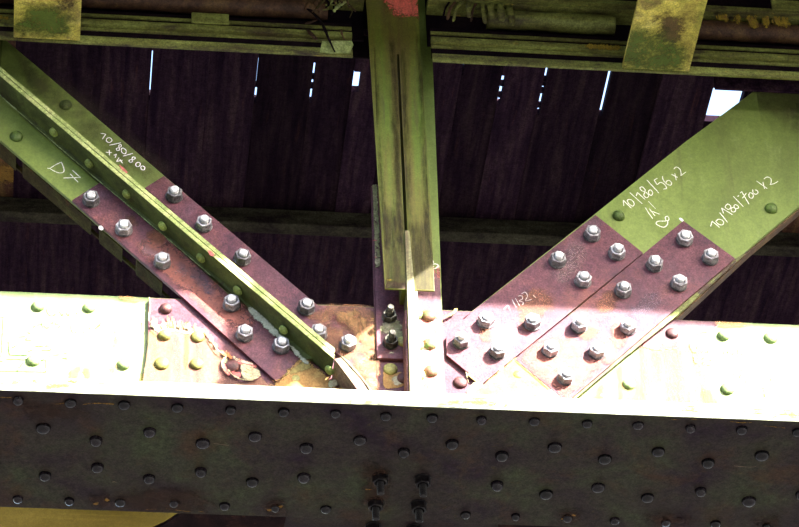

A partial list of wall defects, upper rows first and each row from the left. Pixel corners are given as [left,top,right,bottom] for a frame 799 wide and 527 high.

peeling [148,297,261,381]
corrosion [309,303,380,390]
peeling [418,306,458,393]
corrosion [640,320,746,350]